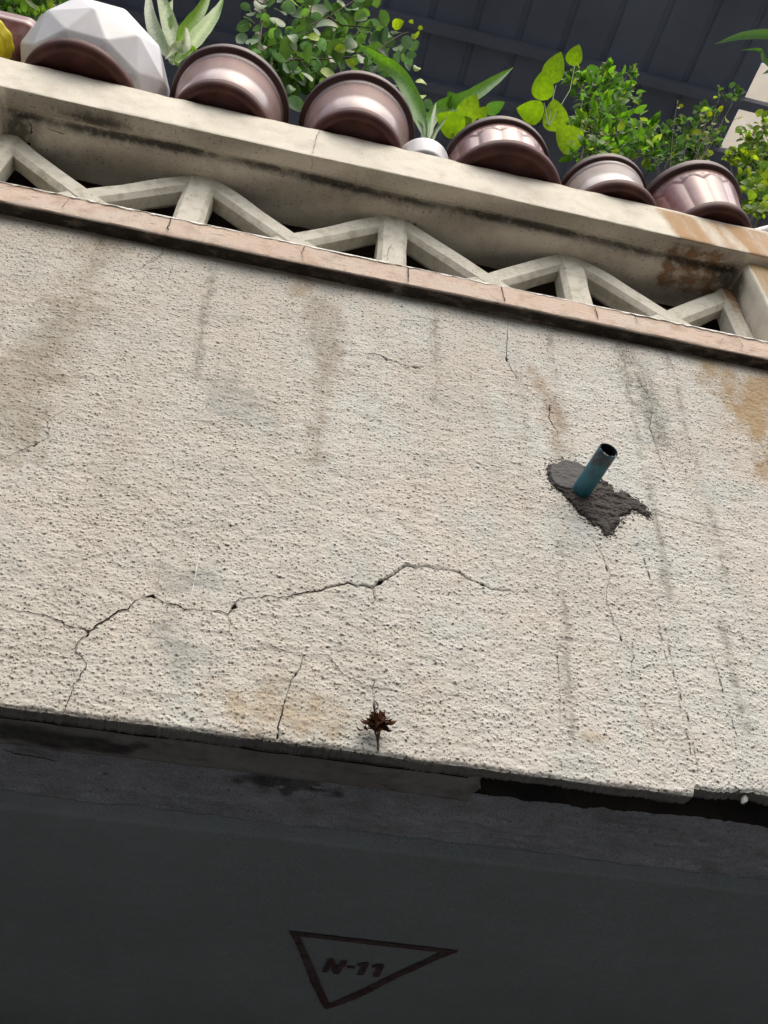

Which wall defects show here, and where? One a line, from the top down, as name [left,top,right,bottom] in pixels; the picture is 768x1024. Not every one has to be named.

leakage [8,89,222,161]
leakage [243,160,584,236]
corrosion [658,209,768,307]
corrosion [725,373,768,441]
crack [0,560,549,778]